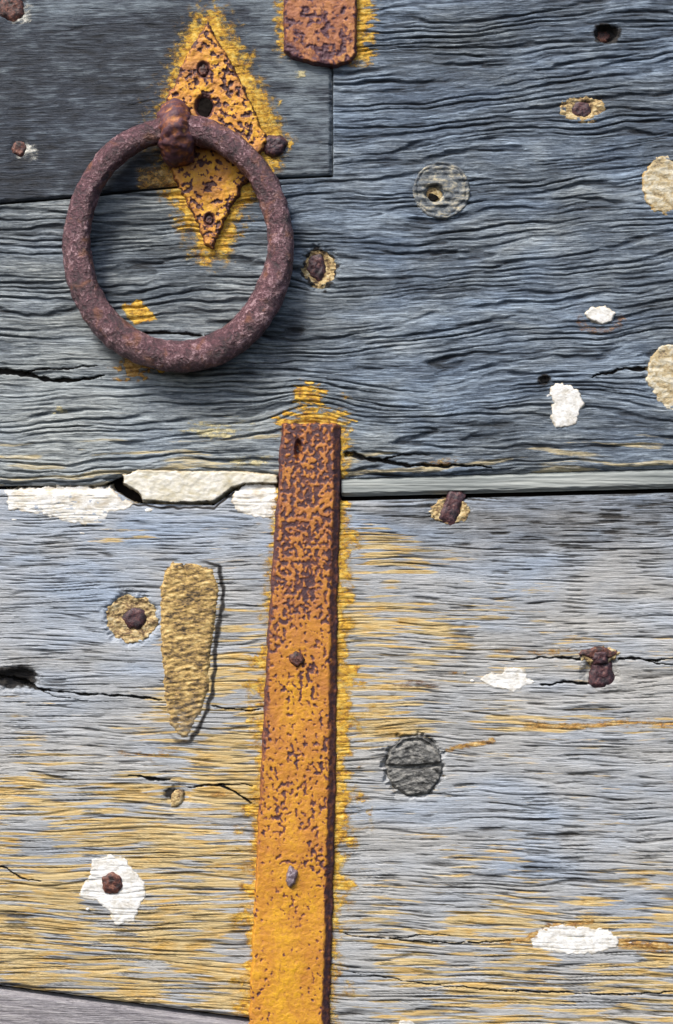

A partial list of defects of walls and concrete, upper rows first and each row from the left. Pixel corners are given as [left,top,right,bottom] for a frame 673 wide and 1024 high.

corrosion [155,0,293,148]
corrosion [260,152,284,172]
corrosion [138,149,256,266]
corrosion [122,299,156,325]
crack [0,365,105,383]
corrosion [183,421,235,438]
crack [133,492,235,510]
crack [511,656,588,686]
crack [618,657,673,665]
crack [0,675,162,702]
corrosion [329,500,373,1023]
corrosion [228,633,268,1017]